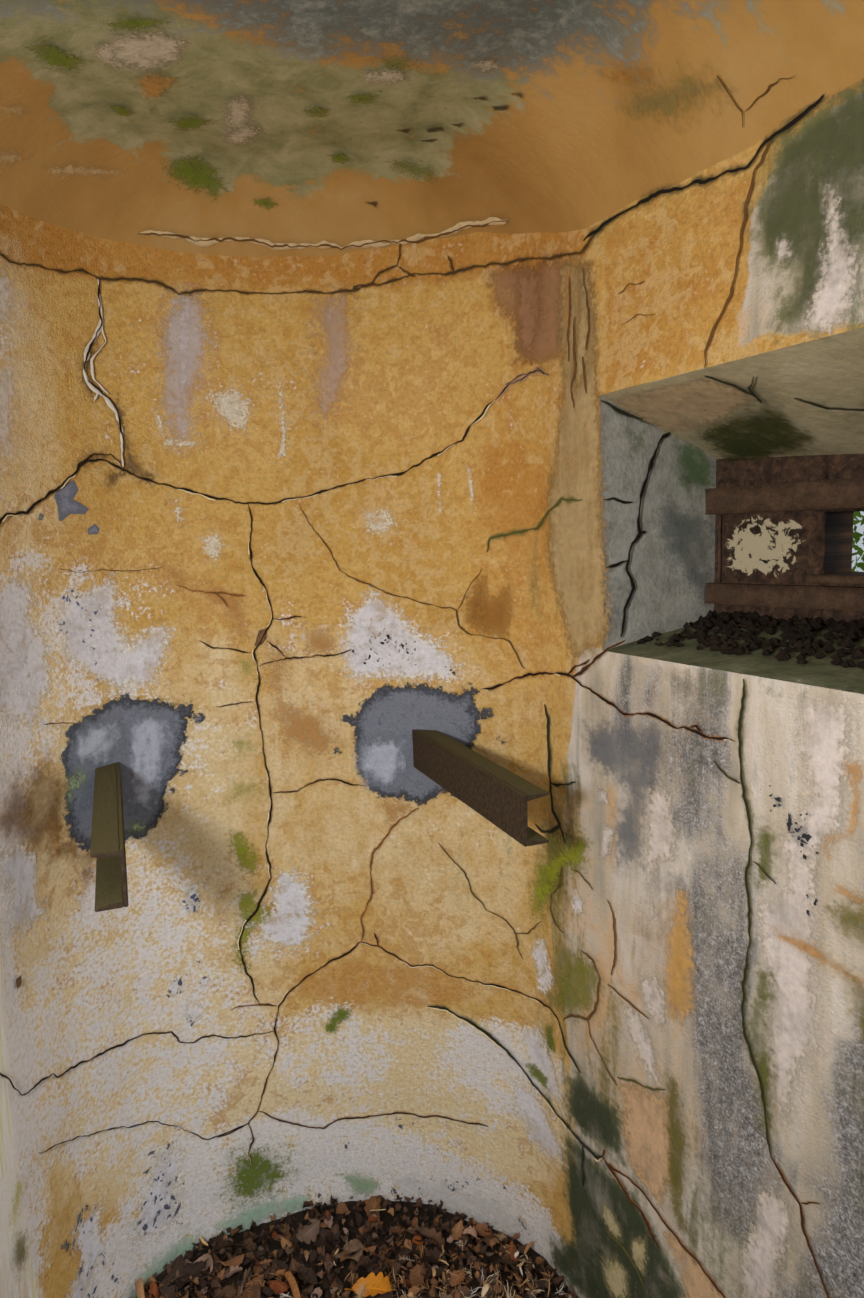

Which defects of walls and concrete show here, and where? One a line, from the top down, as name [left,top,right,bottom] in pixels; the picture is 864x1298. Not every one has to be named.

leakage [474,93,522,110]
crack [717,76,793,128]
leakage [398,123,462,142]
crack [794,398,864,411]
peeling [39,480,99,535]
crack [0,92,827,1165]
crack [300,432,829,1298]
leakage [565,1072,625,1165]